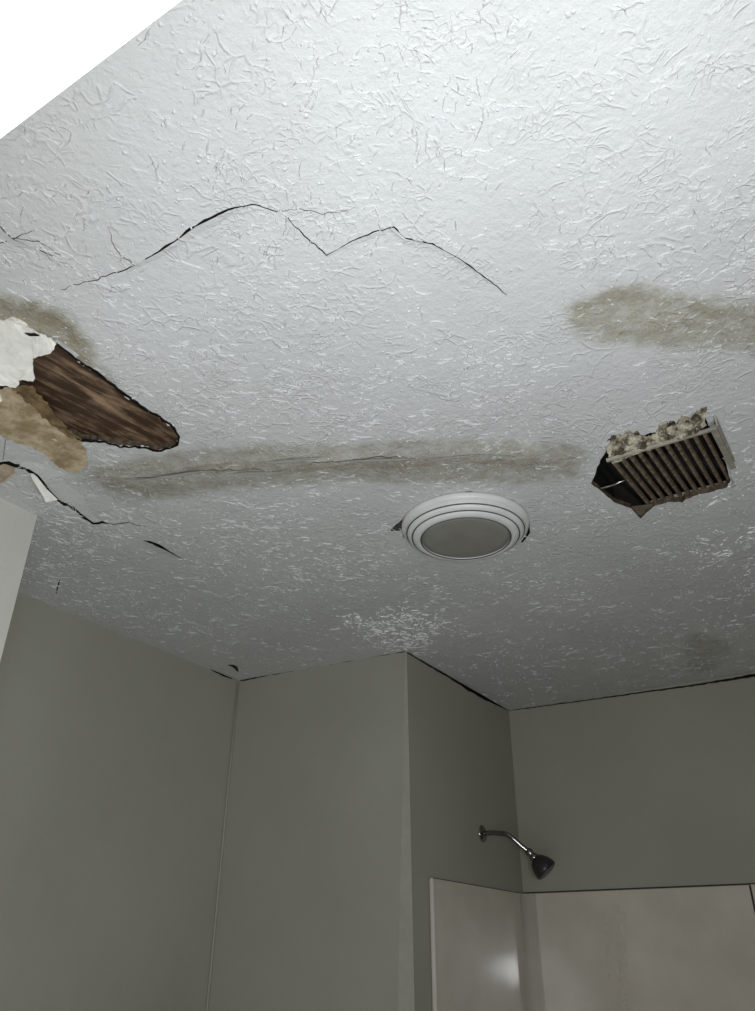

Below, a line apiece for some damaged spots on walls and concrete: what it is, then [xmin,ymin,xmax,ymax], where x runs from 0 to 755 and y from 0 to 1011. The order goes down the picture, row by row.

crack [0,226,60,258]
crack [63,204,507,295]
leakage [573,291,755,345]
peeling [0,317,180,473]
spalling [606,407,707,464]
crack [0,461,145,527]
spalling [632,504,653,516]